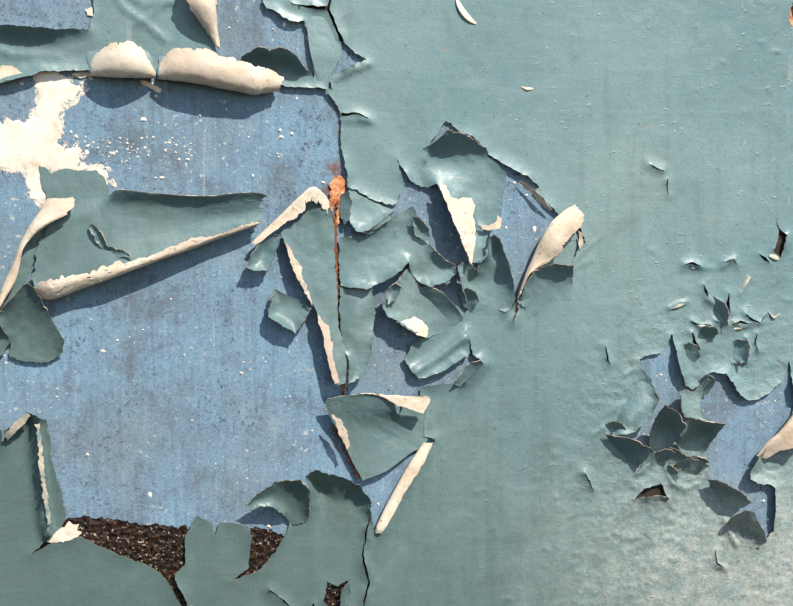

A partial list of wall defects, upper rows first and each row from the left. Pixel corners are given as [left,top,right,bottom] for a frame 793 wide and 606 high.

crack [340,111,367,119]
corrosion [326,164,347,326]
peeling [769,223,787,260]
peeling [0,0,585,606]
peeling [696,296,749,364]
peeling [605,334,793,552]
crack [362,516,370,606]